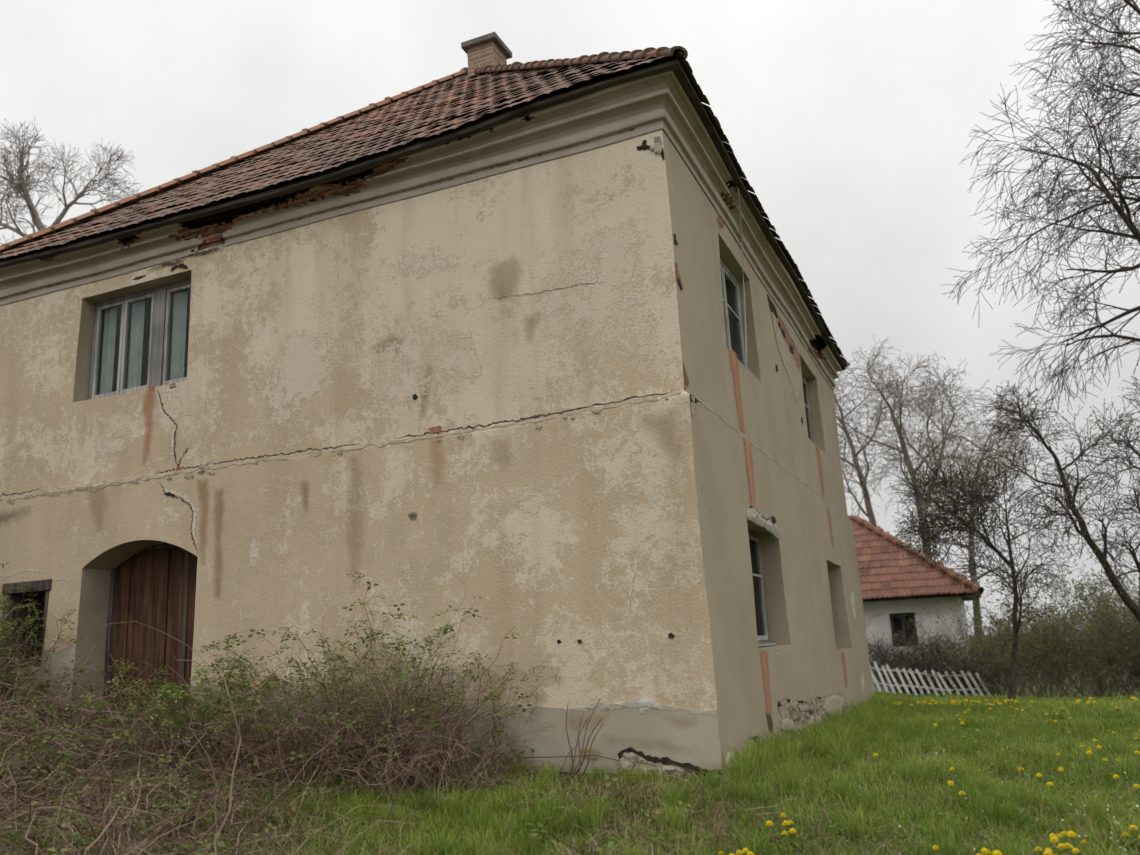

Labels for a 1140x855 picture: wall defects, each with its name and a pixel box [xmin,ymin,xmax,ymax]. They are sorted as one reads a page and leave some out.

crack [395,391,672,439]
crack [155,388,359,550]
flaking render [778,695,848,731]